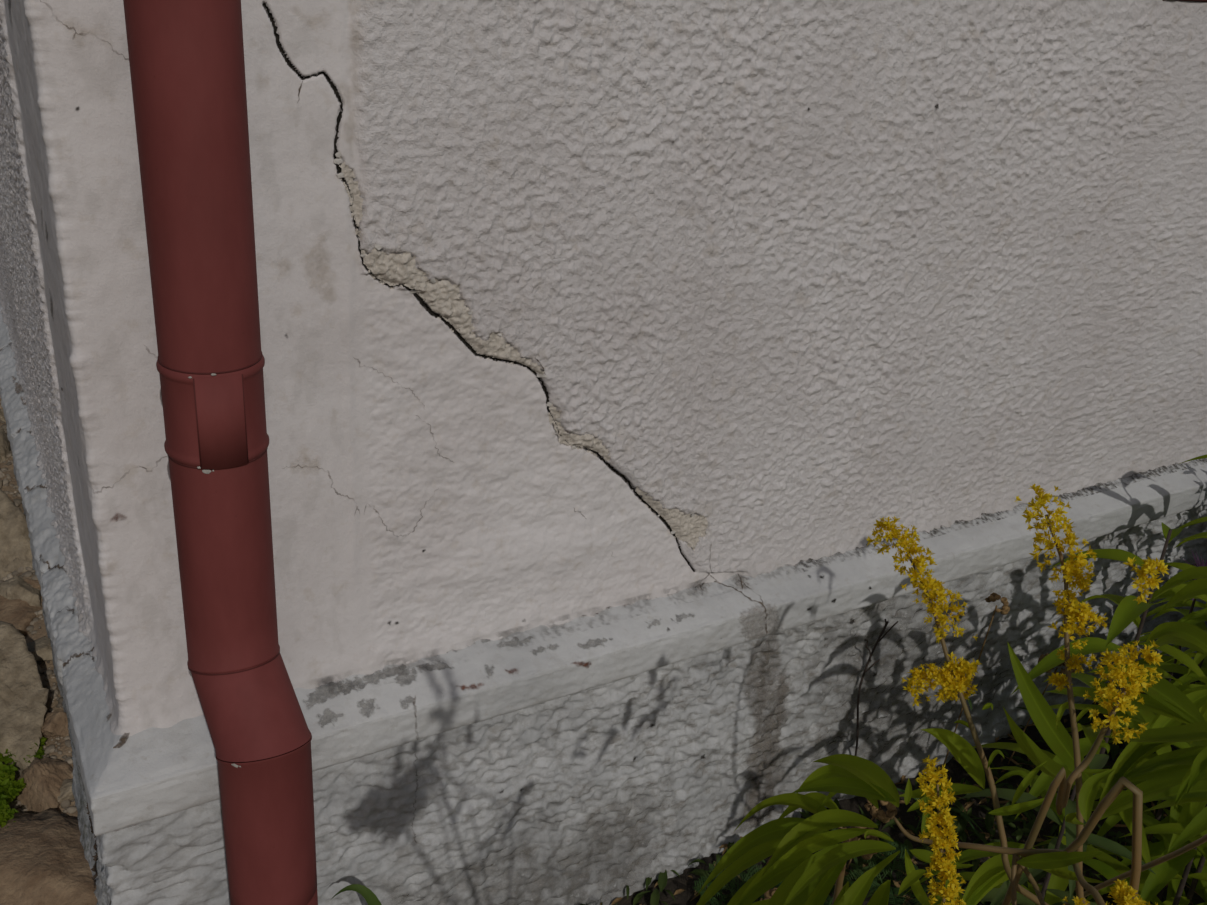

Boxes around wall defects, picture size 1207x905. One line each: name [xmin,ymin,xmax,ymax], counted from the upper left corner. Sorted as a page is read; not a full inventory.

crack [263,3,777,638]
flaking render [546,402,611,461]